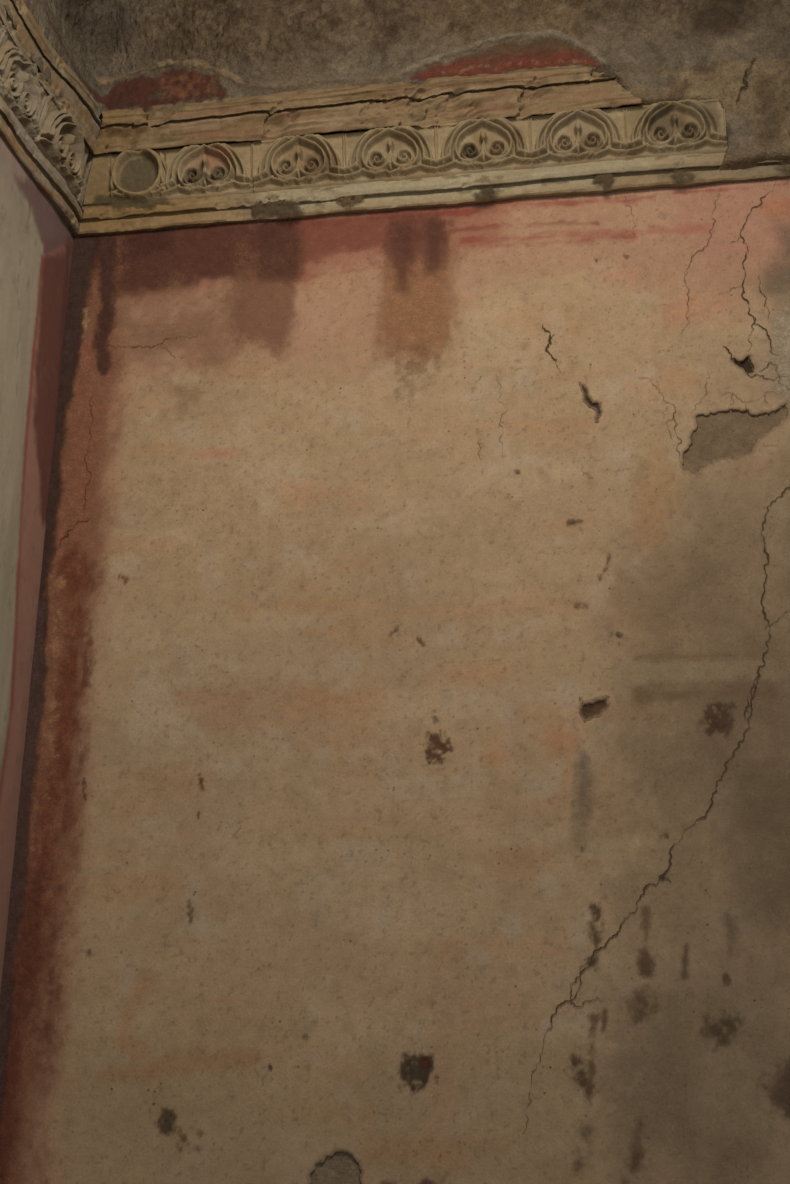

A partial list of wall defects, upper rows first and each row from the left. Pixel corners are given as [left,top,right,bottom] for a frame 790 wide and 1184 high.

leakage [78,208,438,360]
crack [642,178,790,456]
crack [542,324,560,369]
flaking render [681,297,790,475]
flaking render [425,716,452,763]
flaking render [705,703,734,735]
crack [526,486,790,1126]
flaking render [401,1053,434,1090]
flaking render [308,1150,362,1184]